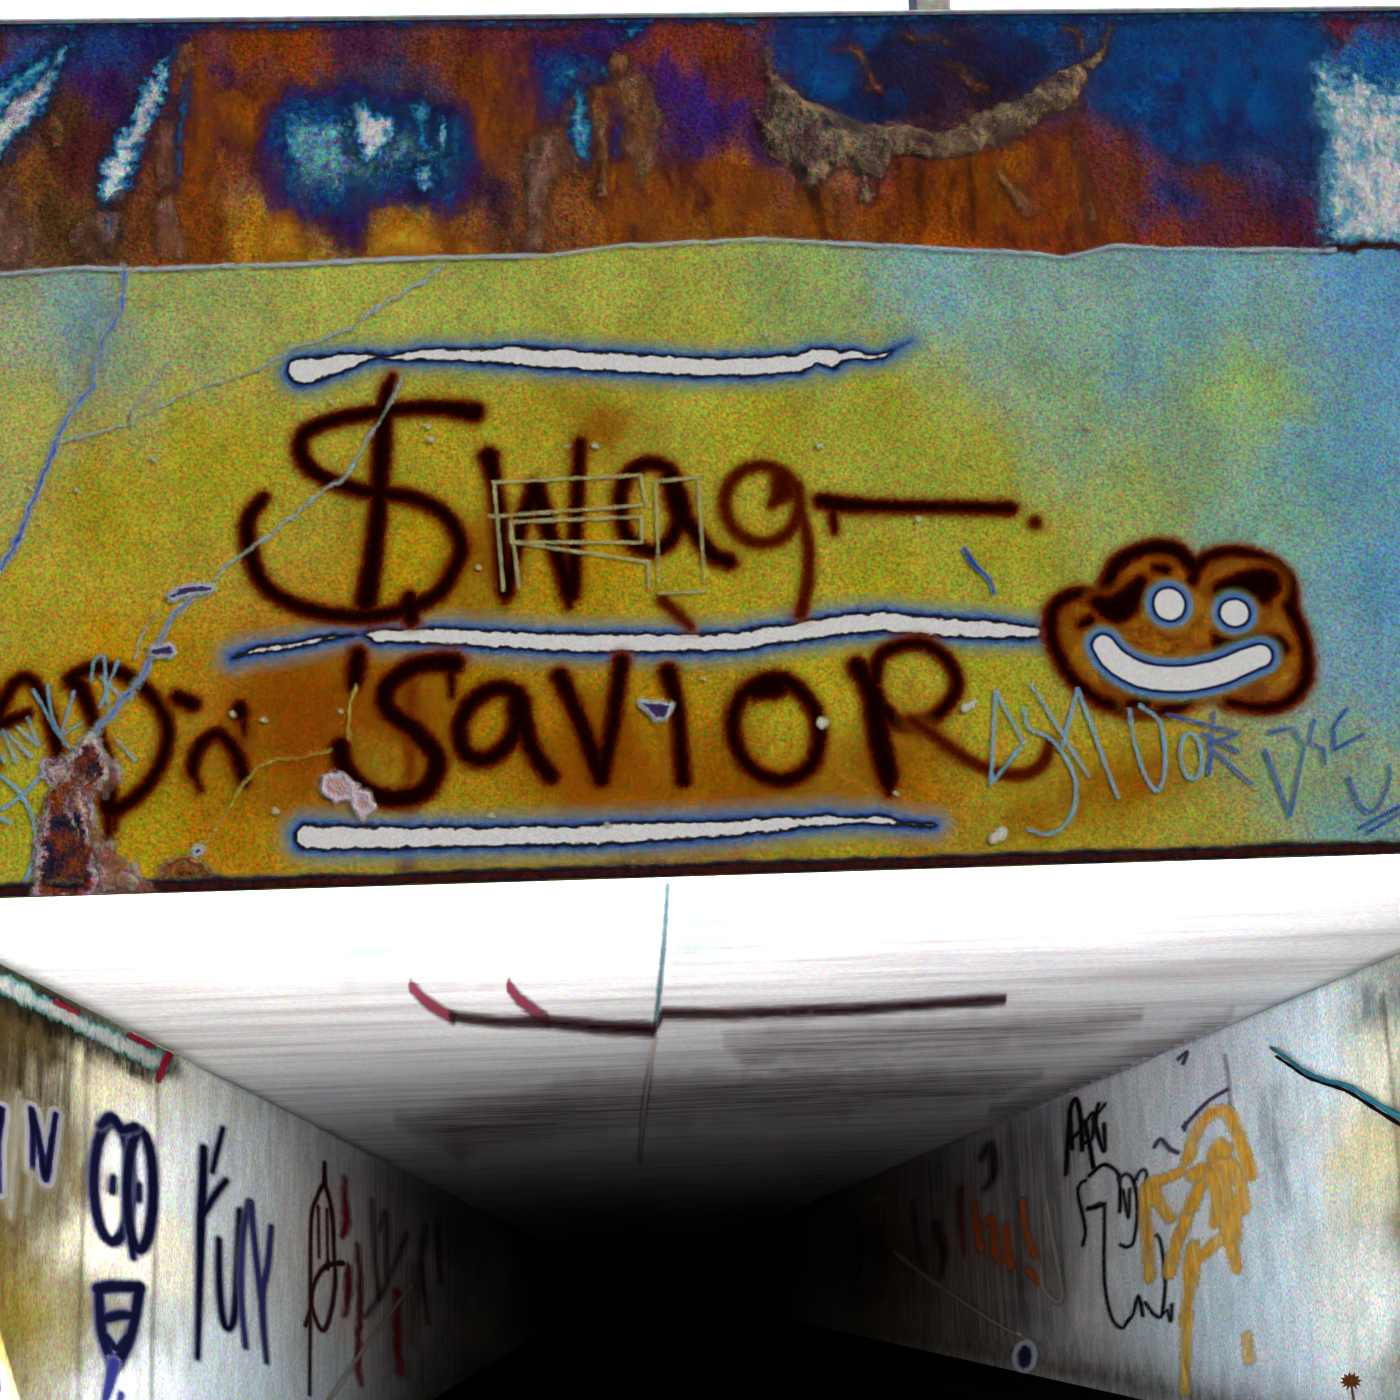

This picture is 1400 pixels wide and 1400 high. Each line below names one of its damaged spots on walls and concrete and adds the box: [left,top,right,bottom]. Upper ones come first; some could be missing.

rust [215,88,275,149]
rust [263,213,306,261]
rust [366,214,485,258]
crack [0,264,445,572]
crack [92,377,403,738]
spalling [29,727,221,896]
crack [203,685,357,844]